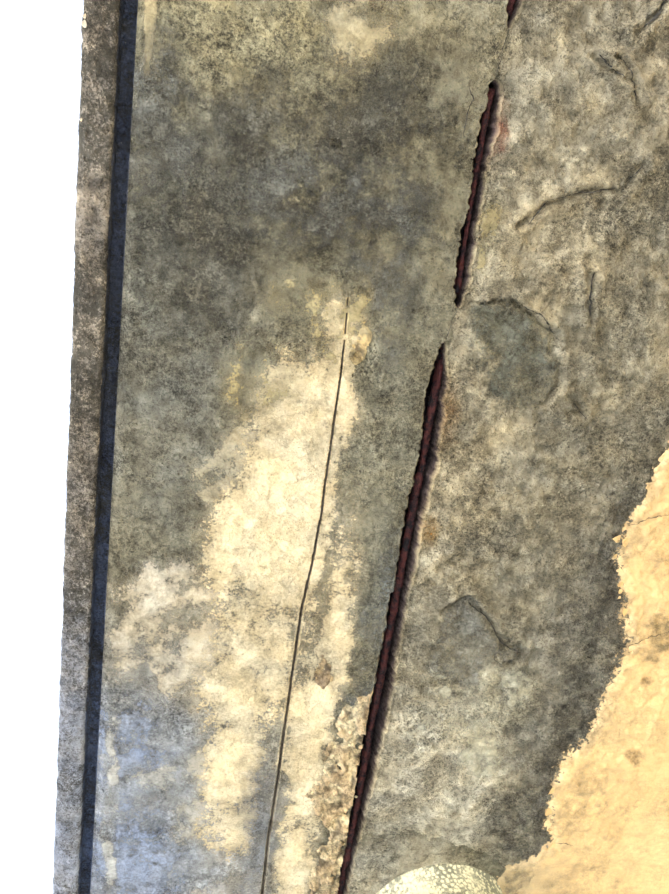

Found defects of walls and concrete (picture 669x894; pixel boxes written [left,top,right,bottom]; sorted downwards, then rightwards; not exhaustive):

peeling [143,0,158,74]
peeling [323,0,395,67]
damp [125,28,445,365]
crack [335,0,526,894]
flaking render [363,0,669,867]
peeling [102,840,117,885]
damp [91,694,190,894]
peeling [105,279,373,894]
crack [259,297,351,894]
damp [359,548,398,650]
damp [407,713,500,778]
damp [500,671,536,715]